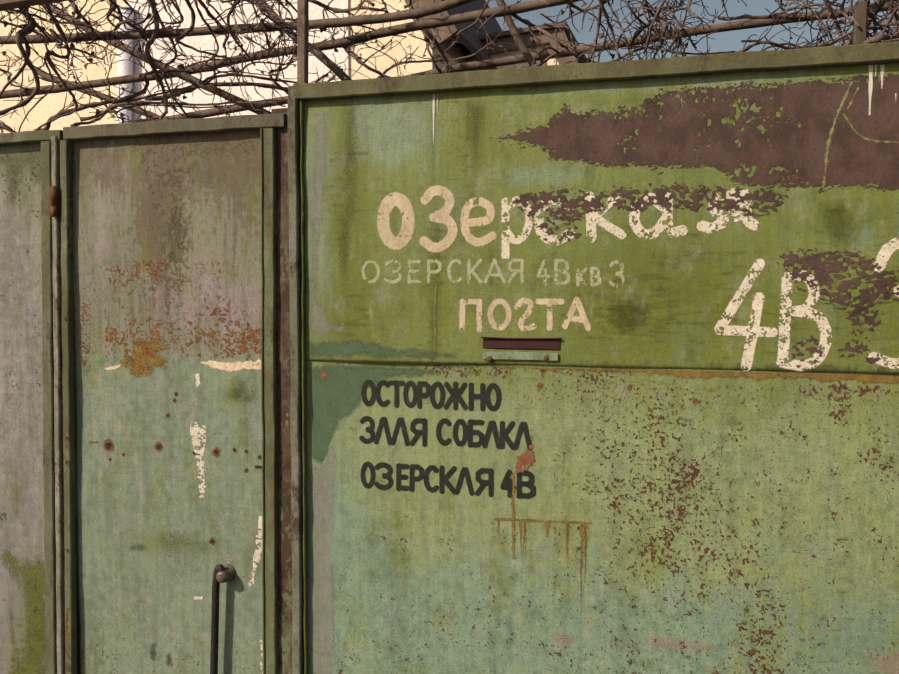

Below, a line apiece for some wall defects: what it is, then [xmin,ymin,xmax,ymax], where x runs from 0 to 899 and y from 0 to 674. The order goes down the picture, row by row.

peeling [489,70,899,241]
peeling [775,248,899,371]
corrosion [121,334,167,377]
peeling [412,365,637,388]
corrosion [535,367,899,384]
corrosion [90,439,125,461]
peeling [190,422,206,503]
peeling [787,379,899,500]
peeling [249,516,262,587]
corrosion [494,437,591,597]
peeling [372,398,899,674]